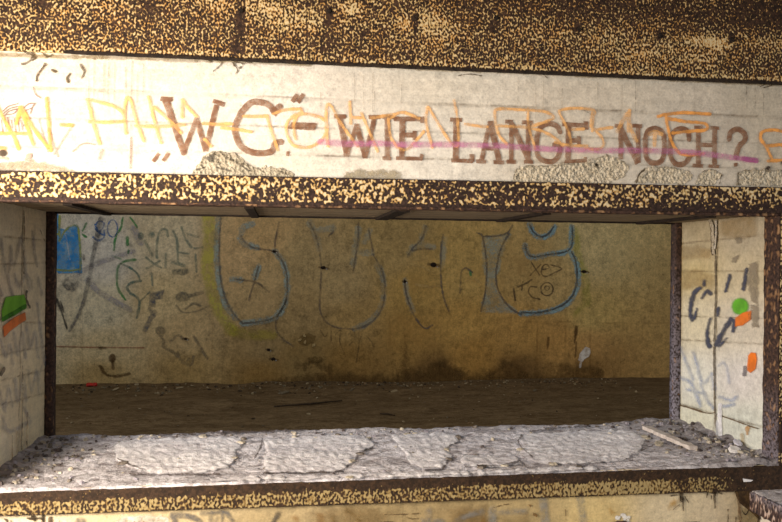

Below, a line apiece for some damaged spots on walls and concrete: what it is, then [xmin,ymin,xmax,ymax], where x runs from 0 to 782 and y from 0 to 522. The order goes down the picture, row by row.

spalling [513,154,629,184]
spalling [635,166,723,186]
spalling [736,161,782,187]
crack [158,429,303,459]
crack [477,425,591,466]
crack [117,458,220,476]